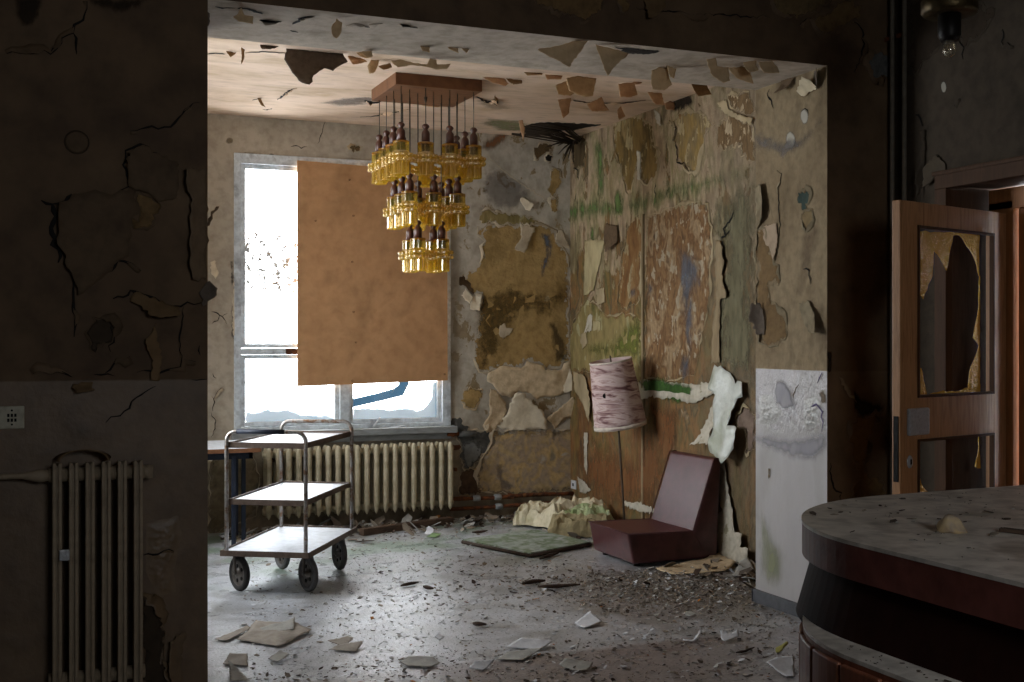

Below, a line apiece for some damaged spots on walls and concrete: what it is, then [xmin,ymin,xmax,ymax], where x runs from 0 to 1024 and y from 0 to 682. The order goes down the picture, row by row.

peeling [331,18,342,39]
peeling [260,45,450,85]
crack [121,102,200,190]
flaking render [483,41,817,213]
flaking render [797,185,815,233]
crack [41,194,81,337]
flaking render [749,184,788,348]
crack [94,260,228,437]
leakage [477,290,562,368]
flaking render [451,197,756,563]
peeling [799,300,815,334]